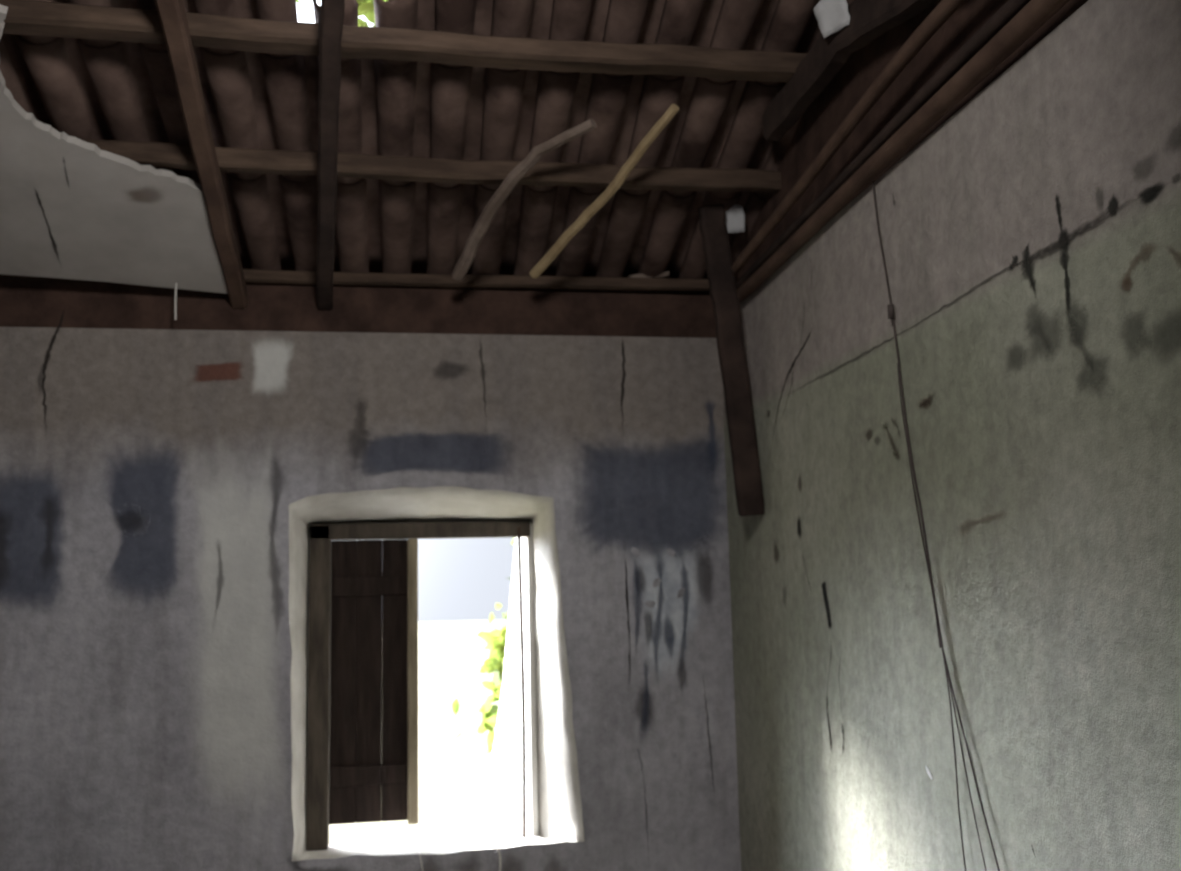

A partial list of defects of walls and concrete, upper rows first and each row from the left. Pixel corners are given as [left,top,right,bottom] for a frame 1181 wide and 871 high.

spalling [312,0,321,23]
spalling [343,0,359,26]
spalling [374,0,418,29]
damp [1010,245,1035,292]
damp [1055,196,1069,313]
damp [1108,196,1117,215]
damp [1140,185,1162,203]
crack [42,314,63,416]
crack [767,214,1105,429]
damp [0,482,58,597]
damp [113,461,174,590]
damp [591,405,714,547]